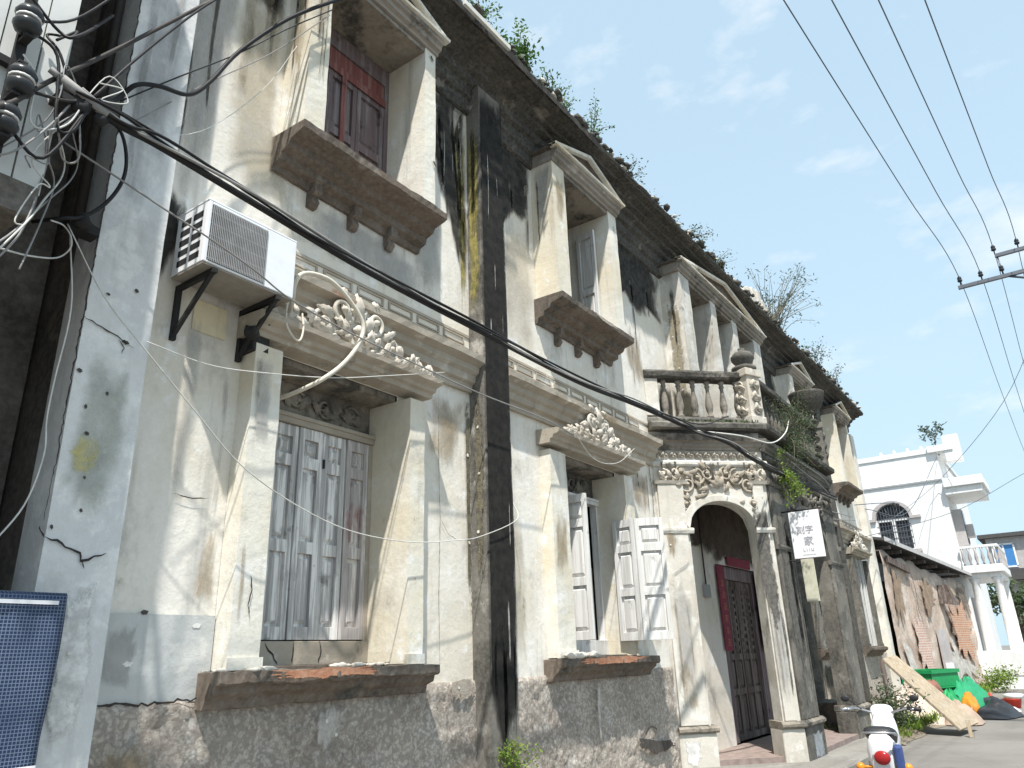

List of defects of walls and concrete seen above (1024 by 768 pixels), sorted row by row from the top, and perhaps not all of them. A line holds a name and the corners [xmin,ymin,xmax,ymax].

crack [39,0,142,568]
damp [618,244,661,381]
damp [434,89,562,750]
crack [97,697,197,707]
crack [265,641,294,664]
spalling [272,666,380,679]
spalling [582,655,649,664]
flaking render [892,568,937,669]
flaking render [946,584,983,682]